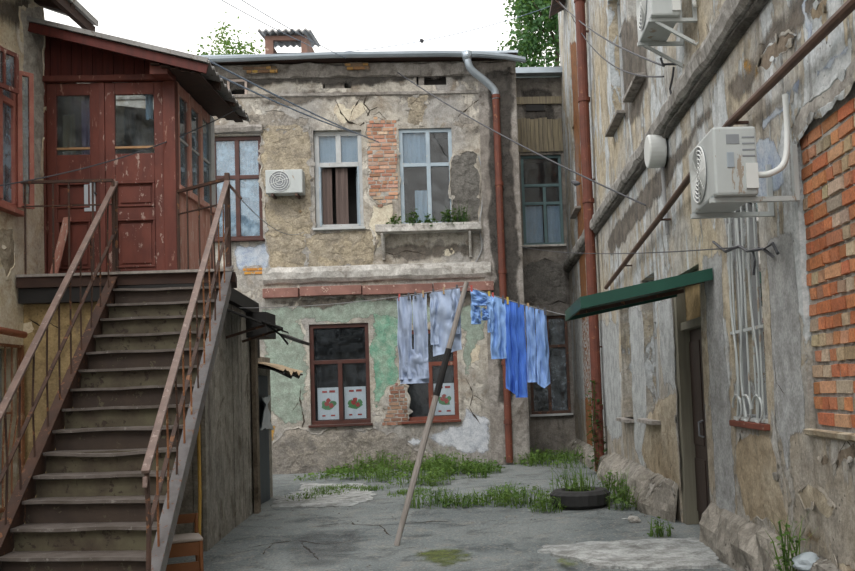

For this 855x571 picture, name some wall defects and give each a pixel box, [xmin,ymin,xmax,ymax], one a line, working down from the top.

spalling [756,29,797,74]
crack [334,96,385,126]
flaking render [363,94,430,208]
spalling [791,55,855,144]
spalling [262,298,452,475]
spalling [817,442,855,467]